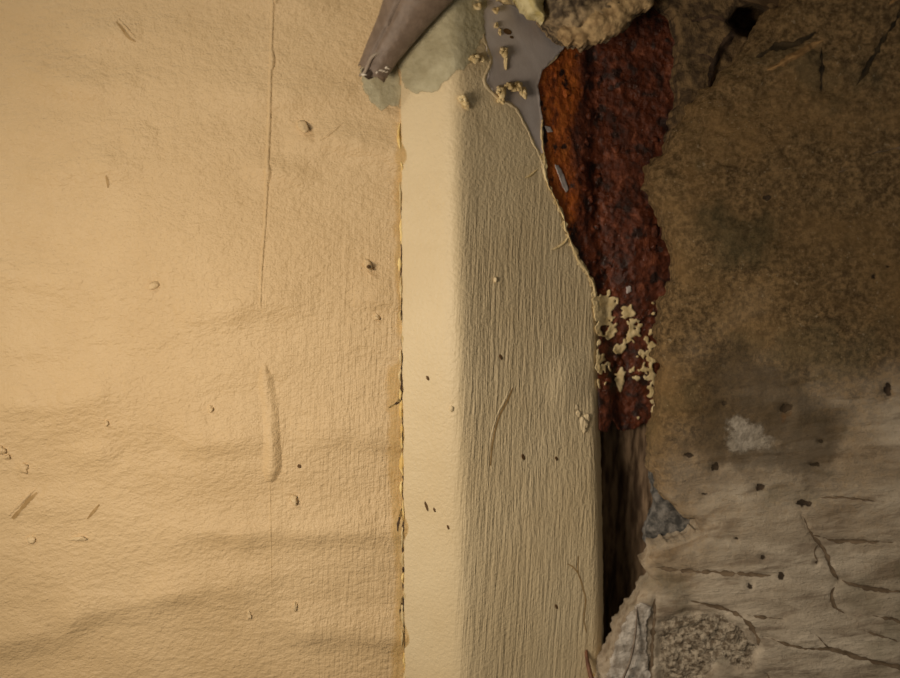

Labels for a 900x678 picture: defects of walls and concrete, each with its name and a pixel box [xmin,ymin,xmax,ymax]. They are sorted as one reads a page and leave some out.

peeling [482,0,657,413]
rust [538,7,675,432]
crack [821,494,873,502]
crack [655,566,771,577]
crack [803,517,900,613]
crack [648,599,656,678]
crack [691,601,900,670]